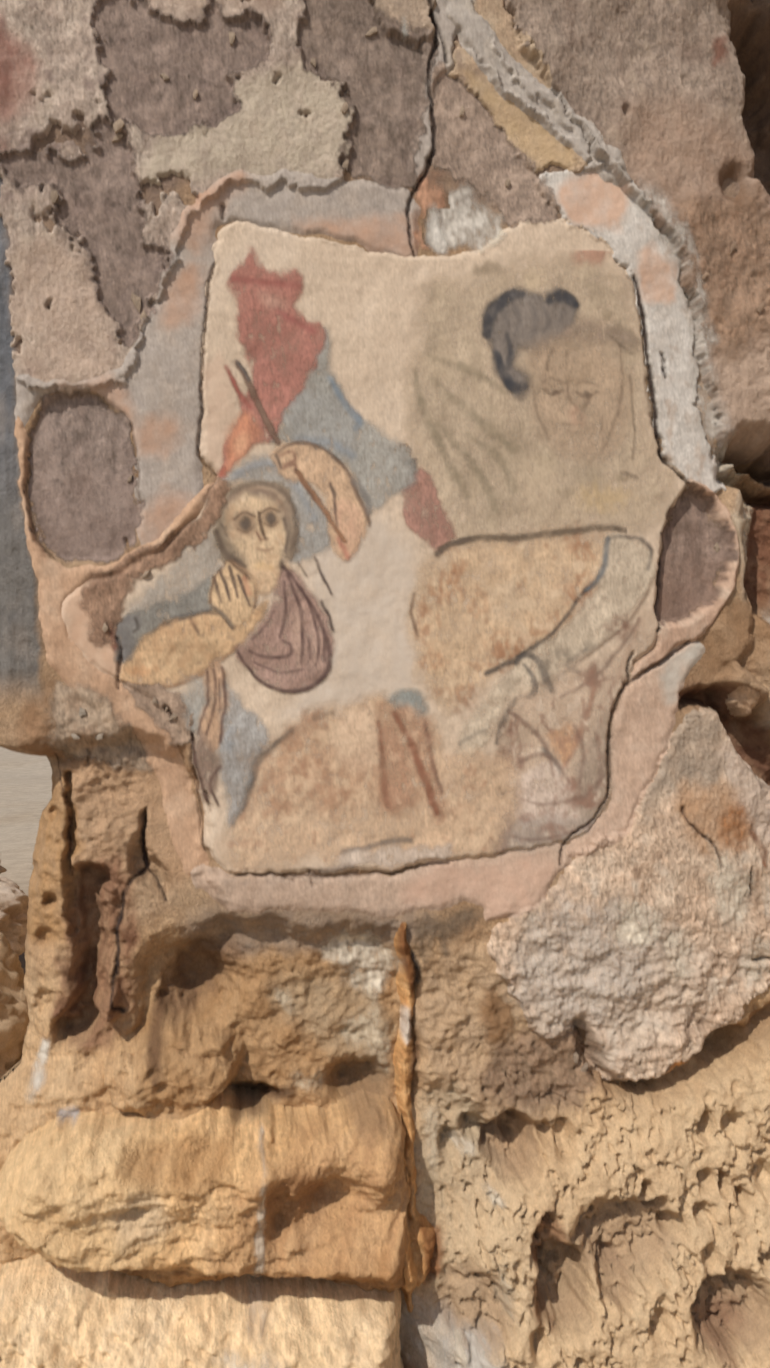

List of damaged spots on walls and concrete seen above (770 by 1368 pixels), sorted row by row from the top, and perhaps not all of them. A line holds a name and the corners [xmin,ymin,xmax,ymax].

spalling [0,0,272,347]
crack [407,0,446,253]
spalling [296,0,561,228]
spalling [28,392,145,563]
crack [633,277,689,483]
spalling [655,485,739,625]
crack [607,560,686,793]
crack [110,809,166,1012]